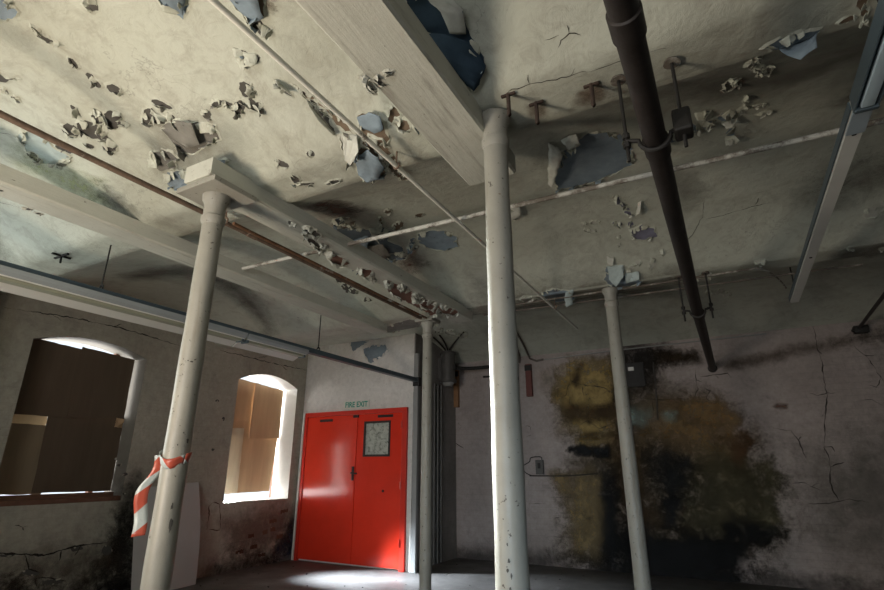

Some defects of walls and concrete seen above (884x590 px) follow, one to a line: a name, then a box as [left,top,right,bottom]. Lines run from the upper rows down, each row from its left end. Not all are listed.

peeling [13,46,265,191]
peeling [157,0,192,22]
peeling [405,0,488,94]
peeling [692,0,873,146]
peeling [330,208,460,263]
crack [10,308,176,345]
water stain [658,351,699,365]
crack [0,542,107,586]
water stain [62,475,140,590]
water stain [528,355,633,573]
water stain [628,379,803,586]
crack [777,328,868,504]